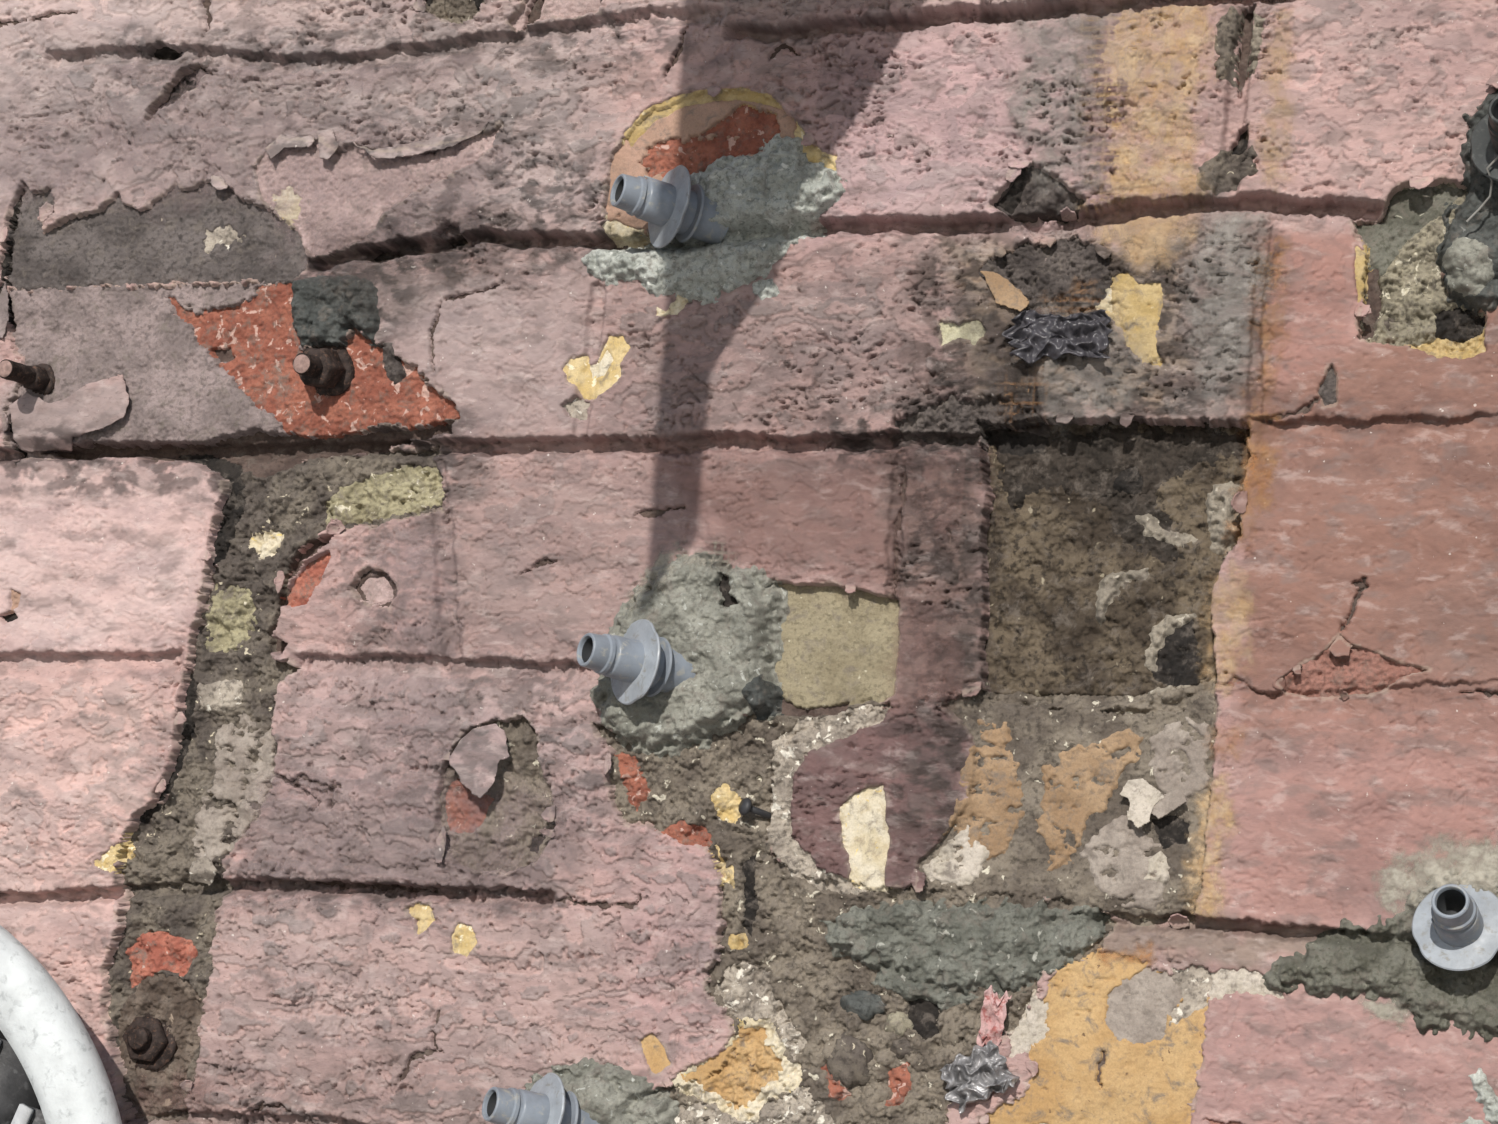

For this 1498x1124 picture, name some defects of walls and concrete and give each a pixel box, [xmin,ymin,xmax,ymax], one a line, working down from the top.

peeling [412,0,484,24]
peeling [511,0,602,32]
peeling [602,86,837,249]
peeling [940,320,986,346]
peeling [980,247,1030,311]
peeling [1095,273,1164,367]
spalling [1353,176,1486,359]
peeling [0,122,500,1123]
crack [1216,677,1279,699]
spalling [597,412,1284,1124]